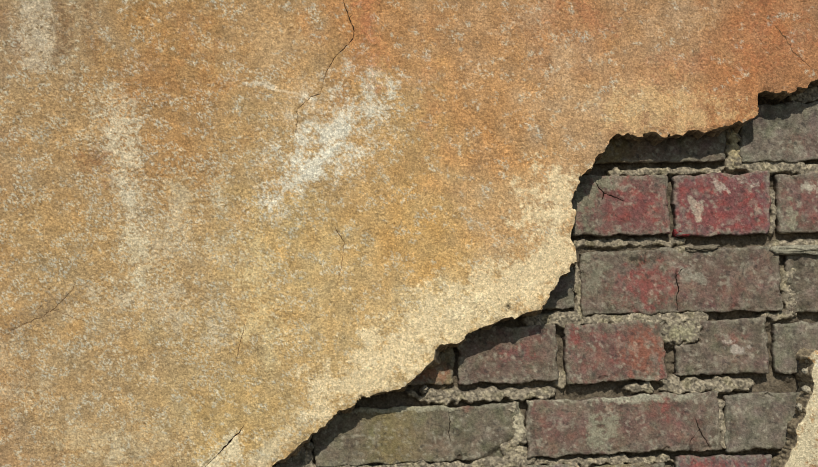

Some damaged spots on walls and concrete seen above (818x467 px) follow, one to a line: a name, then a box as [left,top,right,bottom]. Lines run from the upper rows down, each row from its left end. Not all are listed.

crack [294,3,355,137]
flaking render [196,54,818,467]
crack [207,422,246,465]